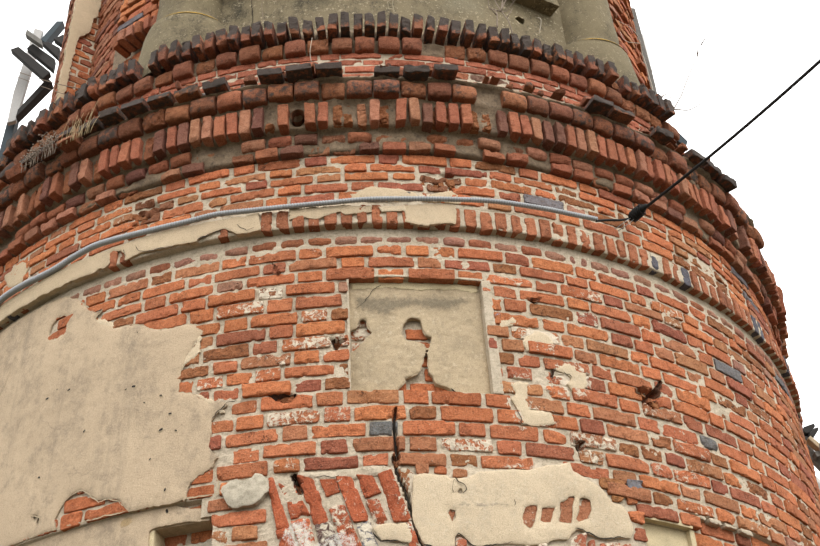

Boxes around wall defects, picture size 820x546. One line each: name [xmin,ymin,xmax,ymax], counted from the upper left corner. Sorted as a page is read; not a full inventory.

flaking render [33,296,225,414]
hole [268,394,296,403]
flaking render [397,318,482,420]
flaking render [181,467,220,502]
crack [373,412,432,546]
flaking render [522,497,592,529]